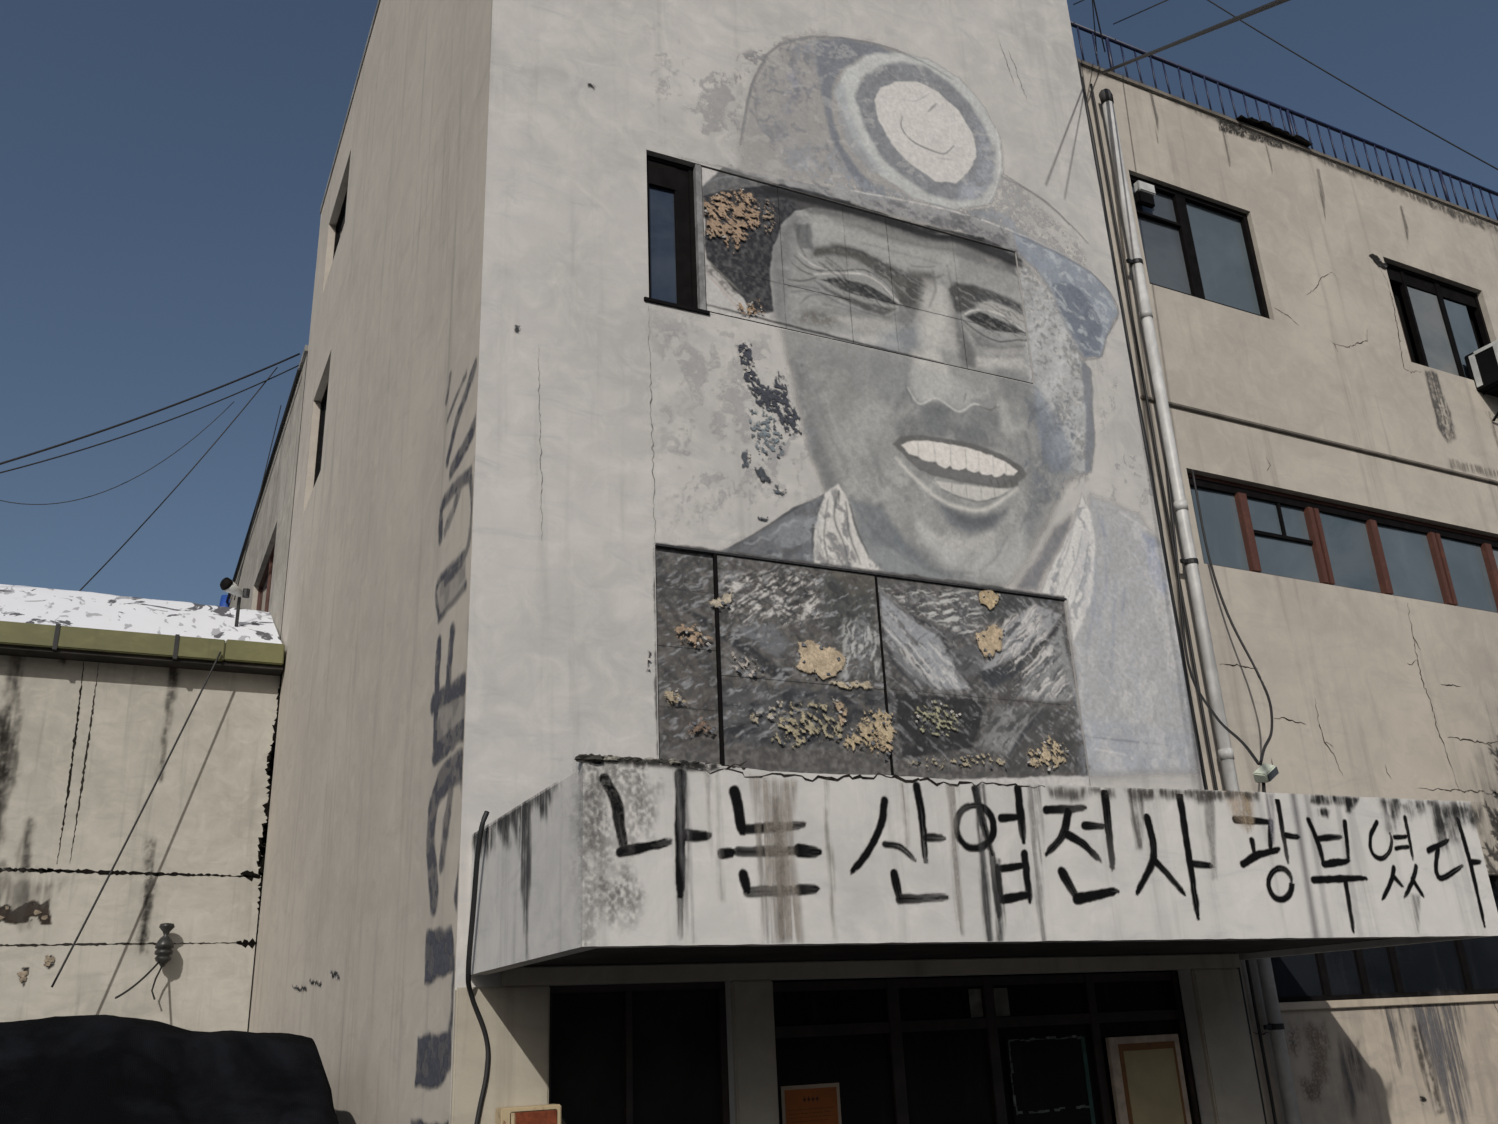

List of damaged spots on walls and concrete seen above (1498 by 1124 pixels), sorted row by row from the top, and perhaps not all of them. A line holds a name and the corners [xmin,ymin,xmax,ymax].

peeling [703,188,775,254]
crack [1332,268,1422,373]
peeling [736,342,802,495]
water stain [1426,372,1454,438]
water stain [0,706,16,813]
crack [0,662,282,948]
peeling [750,642,897,760]
peeling [1027,735,1069,771]
water stain [1382,798,1482,843]
crack [1408,607,1498,795]
flaking render [0,900,51,924]
water stain [1385,1003,1464,1124]